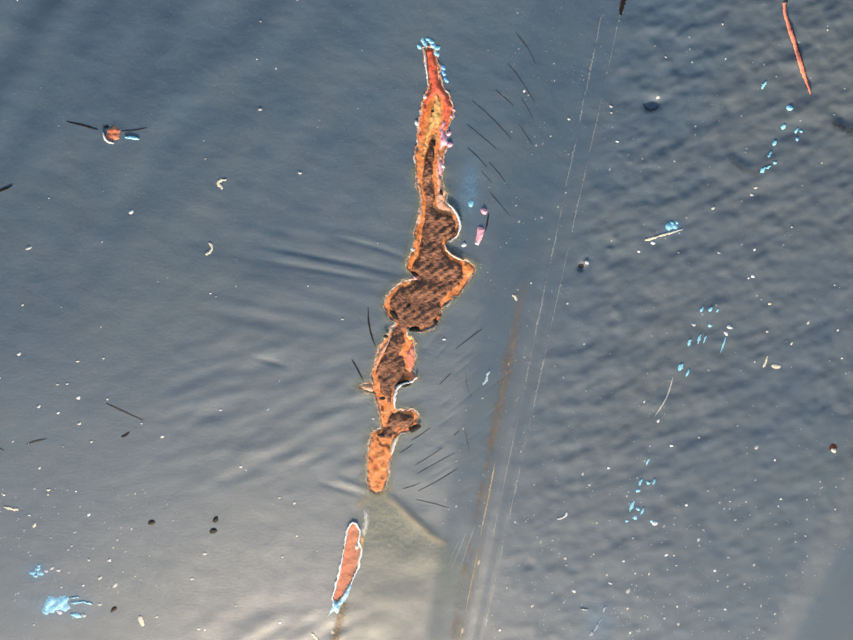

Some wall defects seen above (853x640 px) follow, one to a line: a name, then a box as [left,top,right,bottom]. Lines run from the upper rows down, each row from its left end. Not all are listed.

peeling [352,37,489,497]
peeling [328,509,370,640]